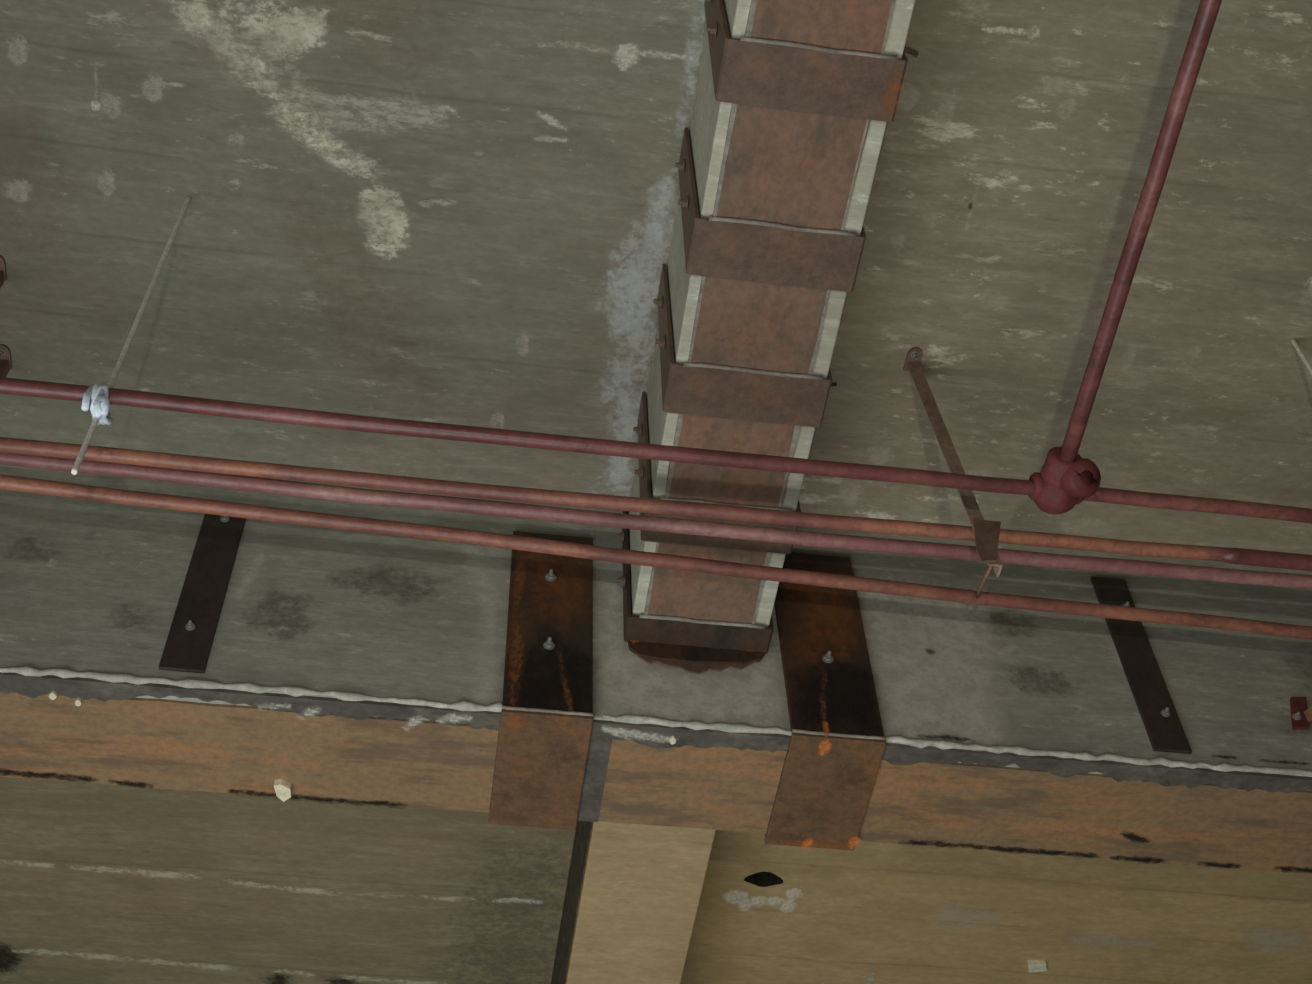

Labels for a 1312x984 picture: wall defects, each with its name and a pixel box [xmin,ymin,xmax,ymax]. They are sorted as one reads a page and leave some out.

rust [819,702,832,756]